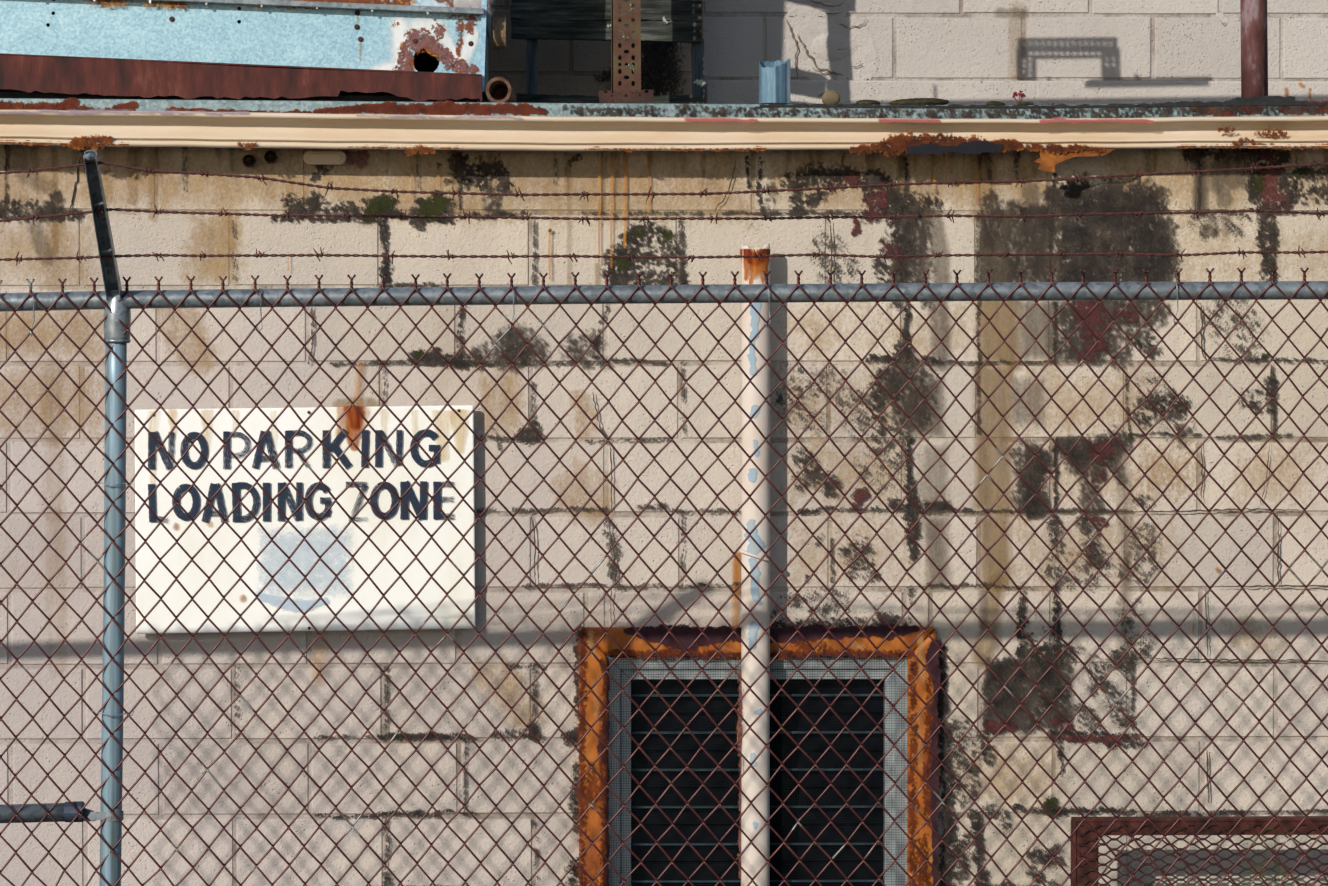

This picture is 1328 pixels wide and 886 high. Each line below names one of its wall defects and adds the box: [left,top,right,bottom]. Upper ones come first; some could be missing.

rust [849,130,1105,188]
leakage [0,145,1328,288]
leakage [329,304,685,451]
leakage [512,498,608,513]
leakage [521,502,740,589]
leakage [770,300,1328,886]
leakage [491,663,545,743]
leakage [560,634,579,747]
leakage [314,666,474,886]
leakage [567,761,579,834]
rust [770,640,934,886]
leakage [564,857,579,886]